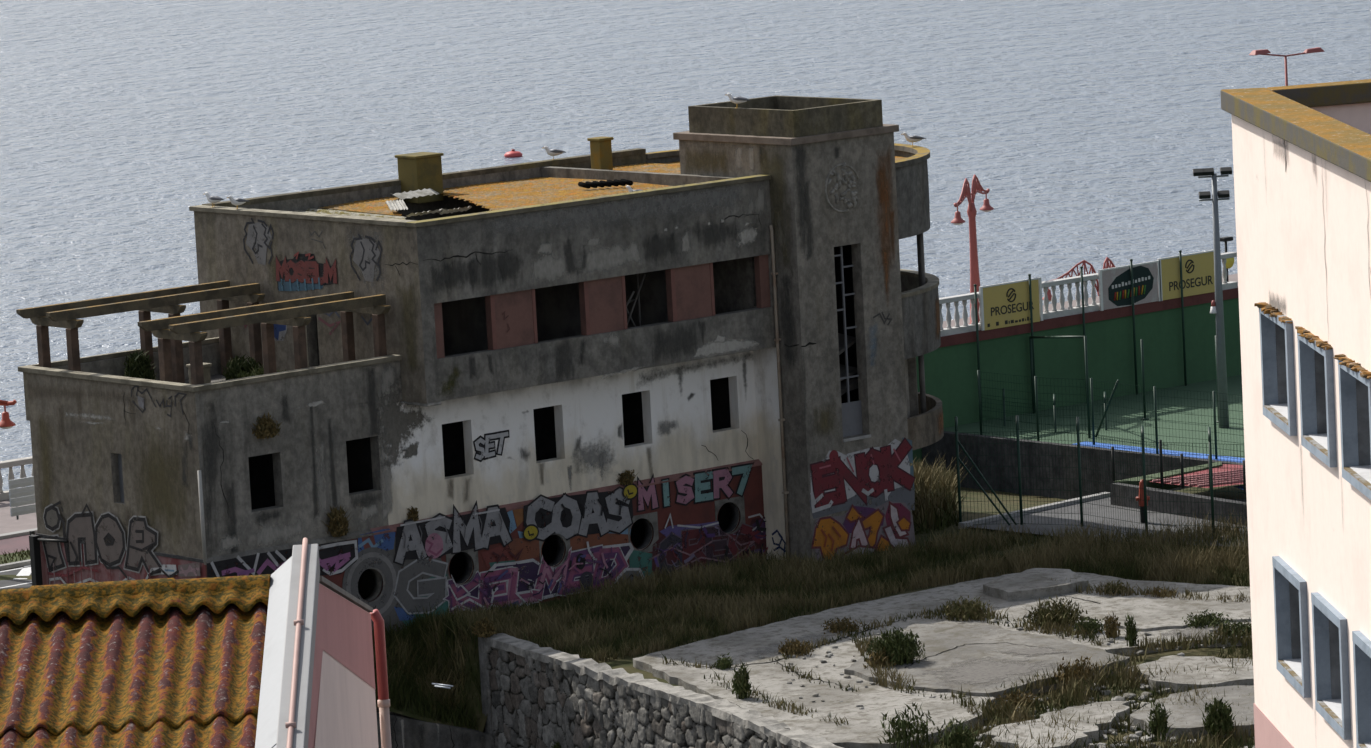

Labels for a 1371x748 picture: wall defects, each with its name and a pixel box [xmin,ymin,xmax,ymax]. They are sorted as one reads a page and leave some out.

crack [385,250,509,275]
damp [433,251,519,287]
damp [487,187,739,272]
corrosion [877,155,894,292]
crack [1363,185,1371,296]
peeling [377,365,431,520]
damp [568,440,613,485]